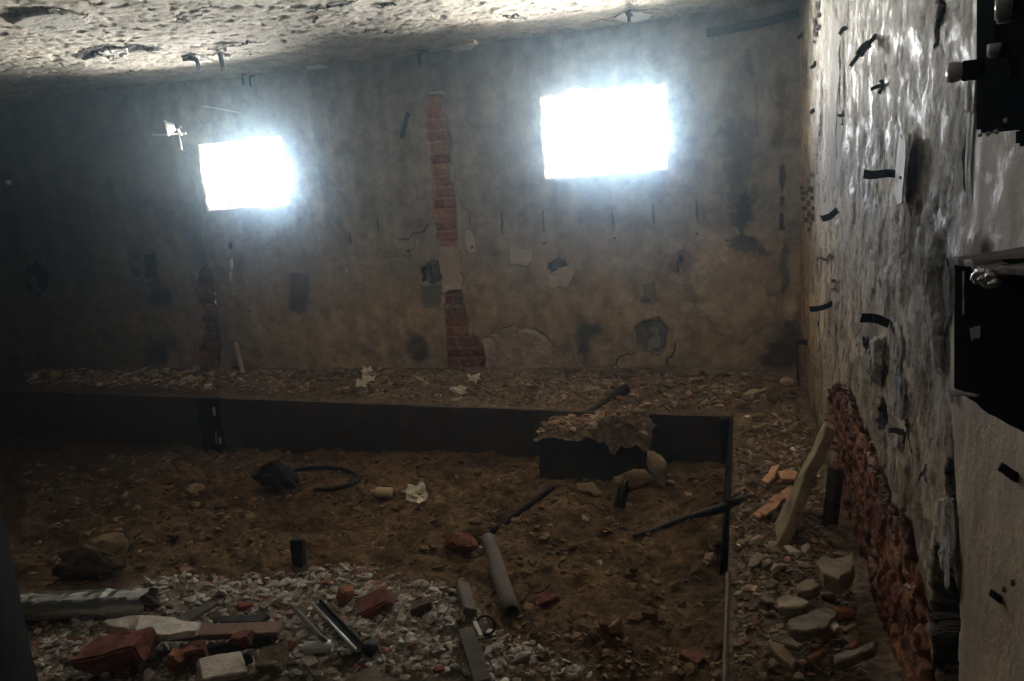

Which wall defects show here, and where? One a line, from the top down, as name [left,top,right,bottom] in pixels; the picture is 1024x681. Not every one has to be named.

spalling [425,91,477,254]
spalling [421,259,485,371]
spalling [621,316,668,355]
spalling [824,383,961,681]